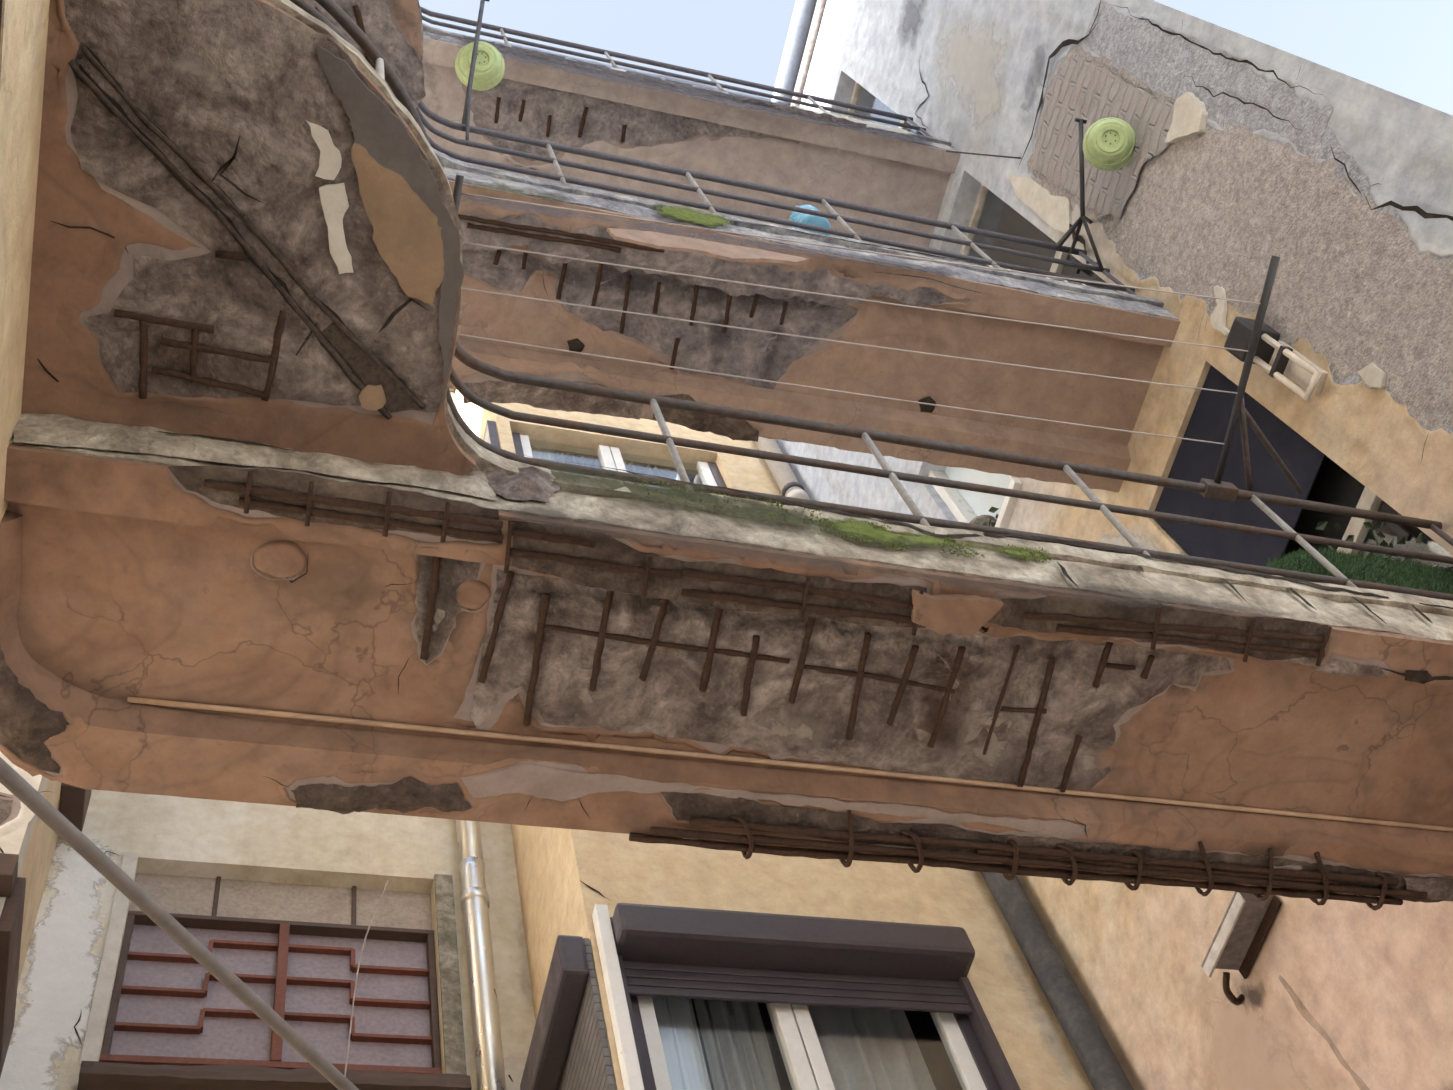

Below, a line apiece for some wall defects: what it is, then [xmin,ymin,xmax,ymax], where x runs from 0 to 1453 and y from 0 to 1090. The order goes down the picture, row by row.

spalling [13,0,1453,792]
crack [287,557,308,583]
spalling [0,646,85,792]
spalling [0,783,35,837]
spalling [264,758,1453,911]